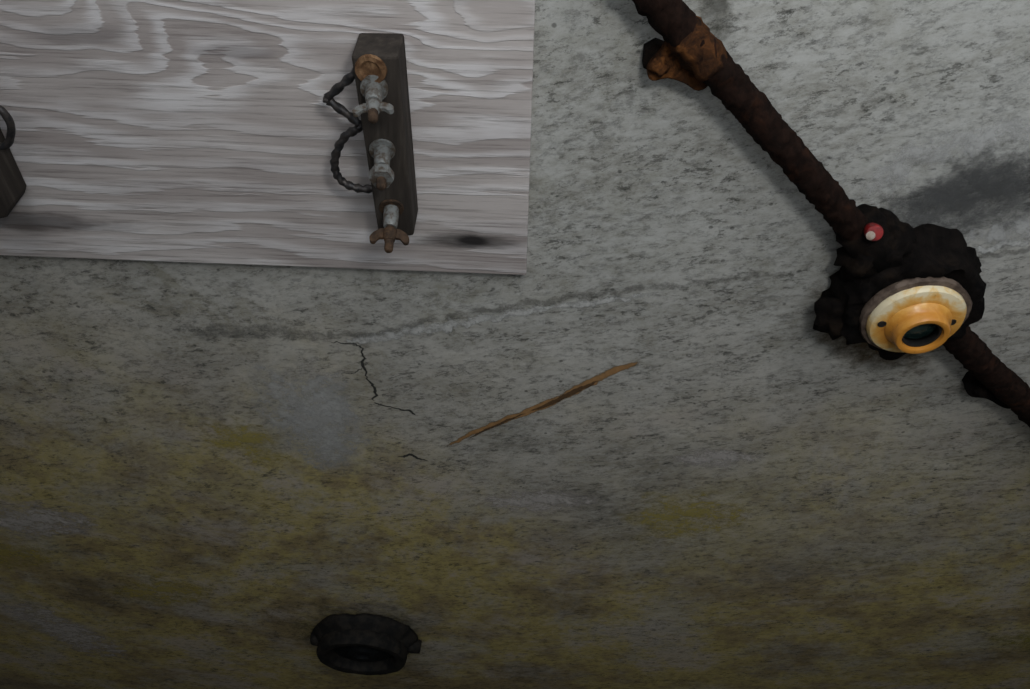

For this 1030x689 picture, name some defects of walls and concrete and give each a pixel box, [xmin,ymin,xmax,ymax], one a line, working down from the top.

leakage [870,120,1030,242]
crack [974,238,1030,254]
crack [329,294,644,415]
corrosion [449,362,638,445]